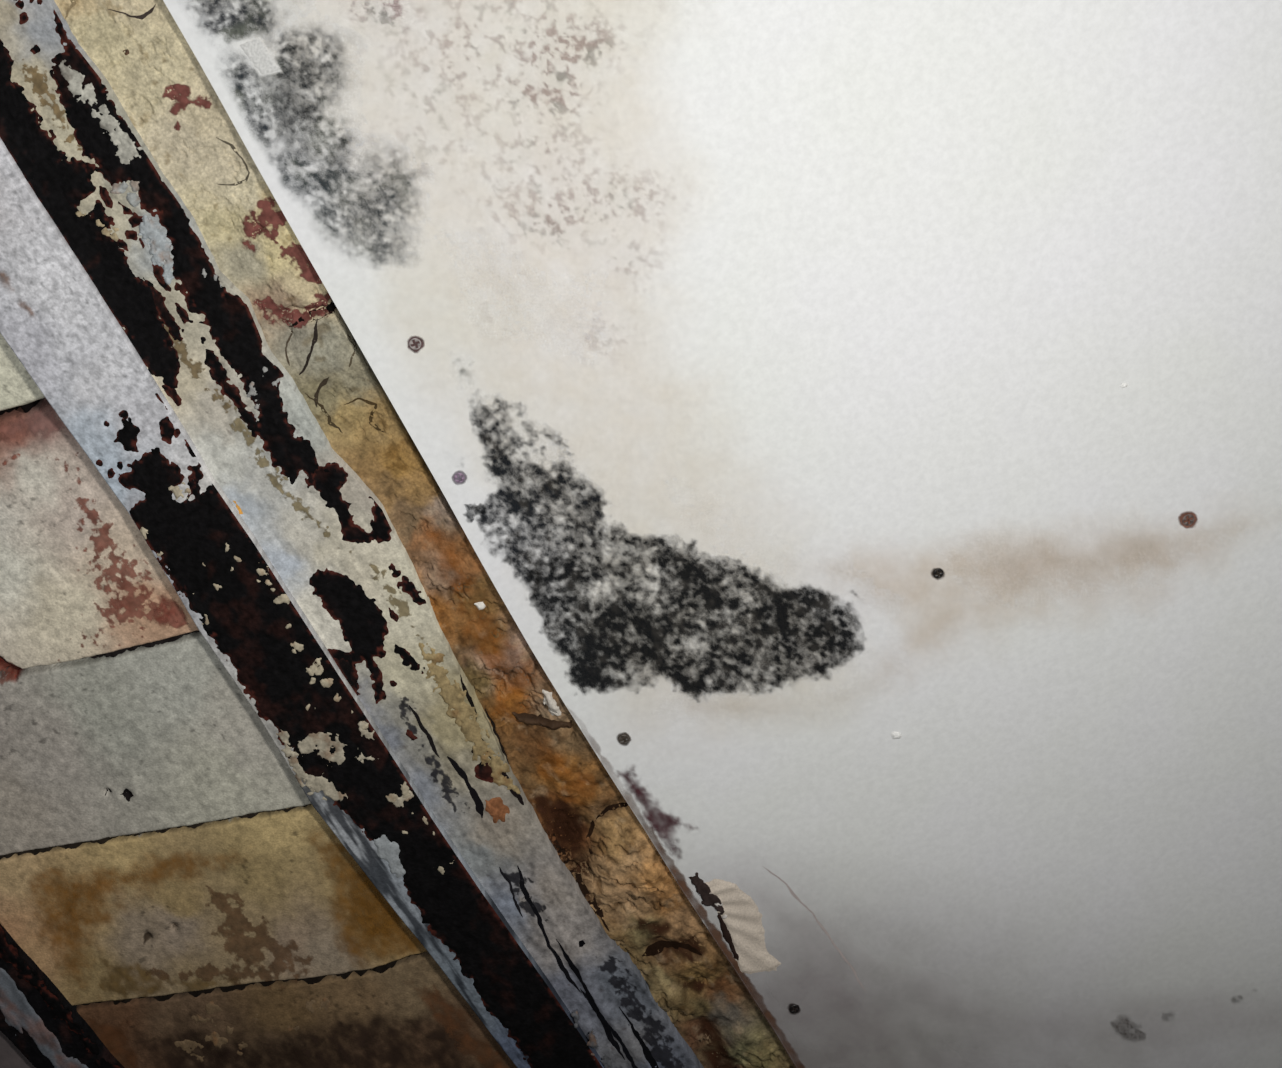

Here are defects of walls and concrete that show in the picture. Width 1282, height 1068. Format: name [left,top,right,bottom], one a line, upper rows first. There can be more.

water stain [202,0,272,40]
peeling [163,84,211,131]
water stain [232,34,410,261]
peeling [242,197,332,328]
crack [0,398,44,415]
peeling [56,455,187,647]
rust [0,0,603,1068]
water stain [465,399,863,698]
peeling [0,968,88,1068]
water stain [100,886,503,1068]
rust [640,921,704,962]
rust [702,1019,736,1068]